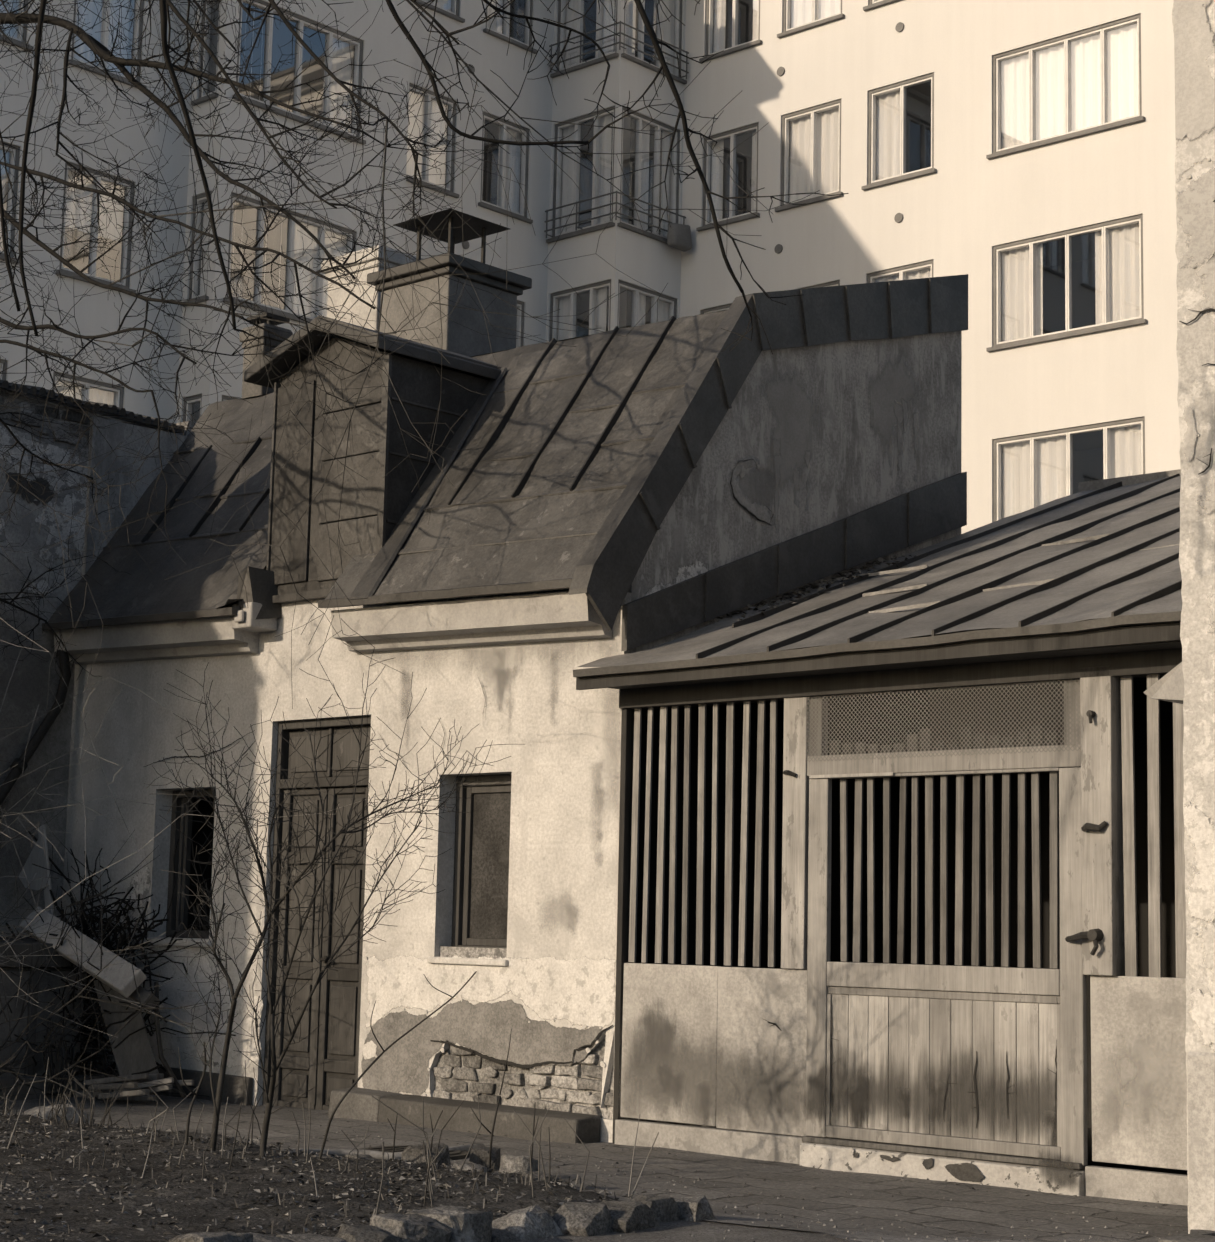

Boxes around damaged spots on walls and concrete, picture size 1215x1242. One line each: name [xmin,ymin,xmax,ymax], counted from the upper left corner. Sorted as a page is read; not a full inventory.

flaking render [1174,0,1215,314]
flaking render [0,423,89,603]
peeling [1184,801,1215,922]
peeling [361,955,616,1117]
water stain [625,1014,1075,1186]
peeling [1190,988,1215,1051]